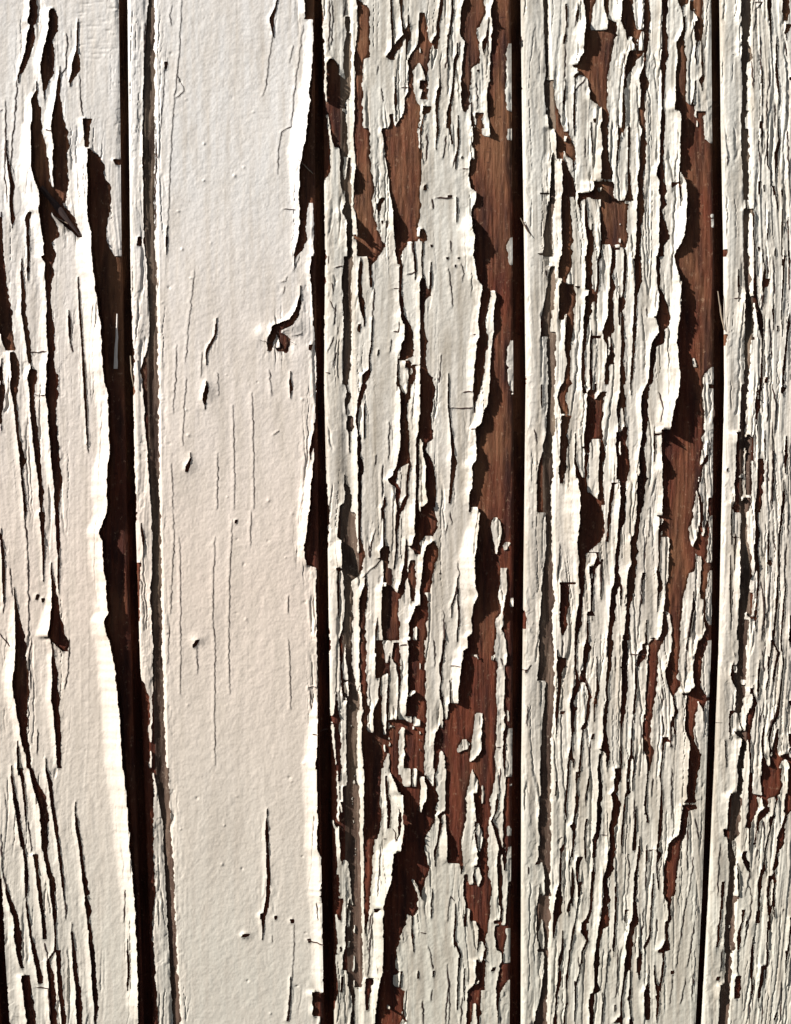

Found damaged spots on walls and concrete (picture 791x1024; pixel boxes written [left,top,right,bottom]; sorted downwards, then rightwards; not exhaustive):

peeling [0,0,182,1024]
peeling [265,0,791,1024]